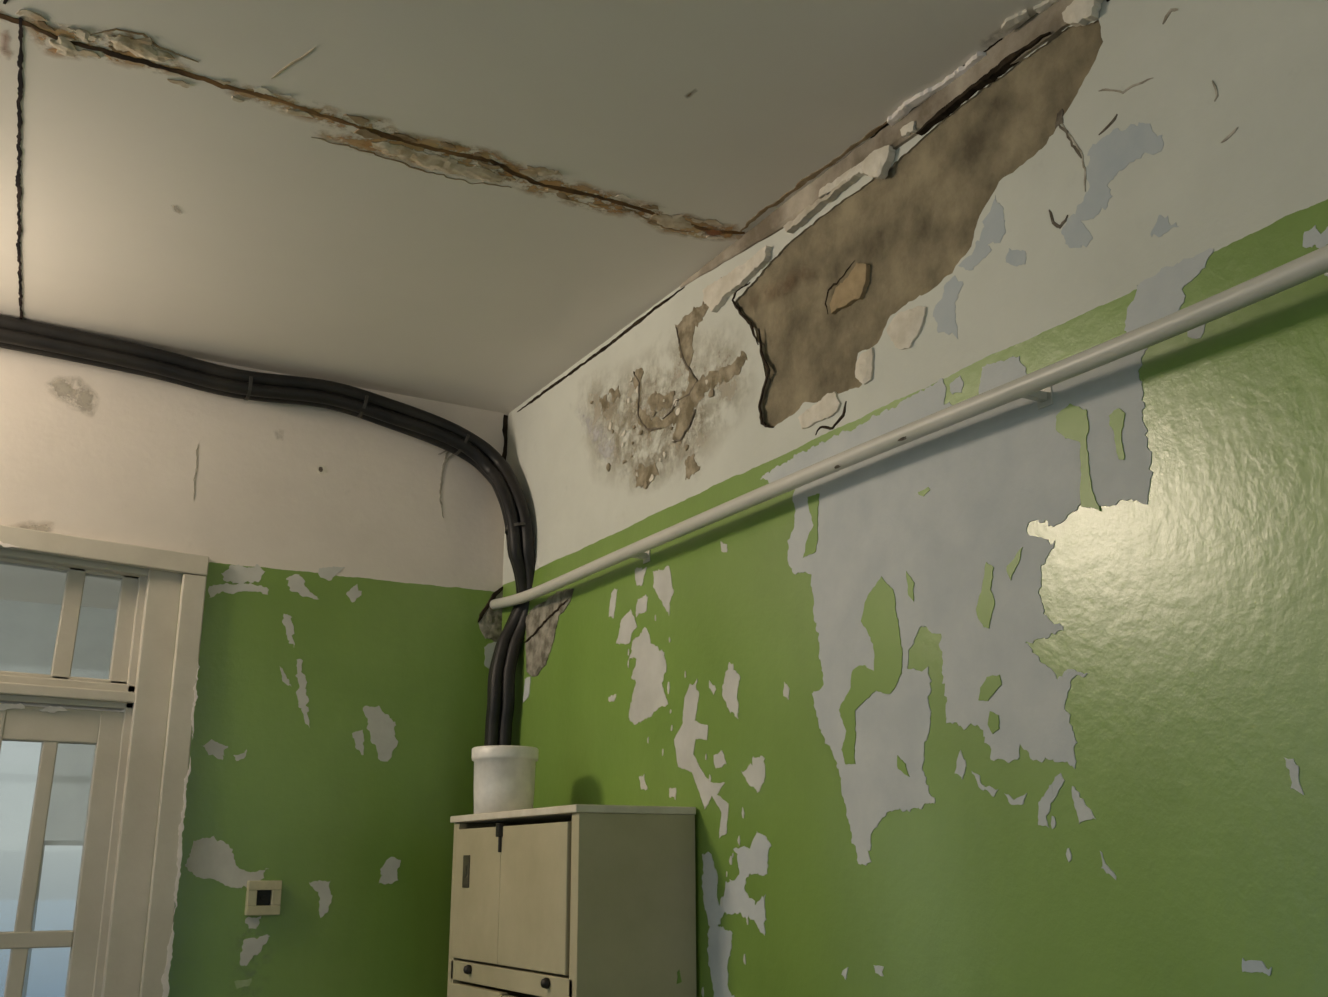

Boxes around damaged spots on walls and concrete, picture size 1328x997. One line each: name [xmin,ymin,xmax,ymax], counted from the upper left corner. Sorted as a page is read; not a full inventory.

crack [0,0,745,319]
peeling [1124,248,1214,332]
peeling [1187,324,1205,339]
peeling [590,0,1164,865]
peeling [208,564,269,598]
peeling [286,566,345,600]
peeling [346,585,362,602]
peeling [191,665,247,761]
peeling [279,614,310,728]
peeling [352,706,398,762]
peeling [608,566,771,997]
peeling [161,758,270,997]